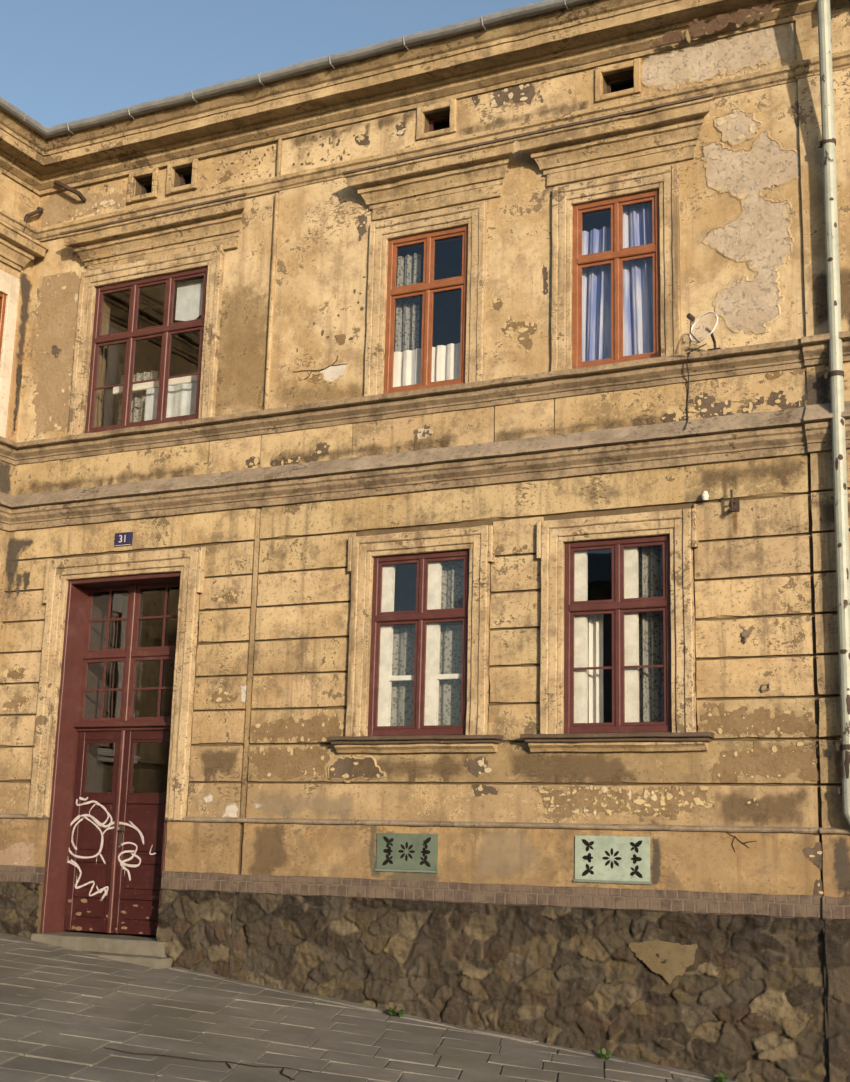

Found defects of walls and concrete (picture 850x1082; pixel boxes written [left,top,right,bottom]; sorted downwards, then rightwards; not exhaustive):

peeling [641,3,797,91]
peeling [472,83,544,108]
peeling [700,108,800,335]
peeling [491,297,543,352]
peeling [306,362,349,385]
peeling [645,367,808,424]
peeling [247,713,386,783]
peeling [535,702,821,820]
water stain [834,837,850,898]